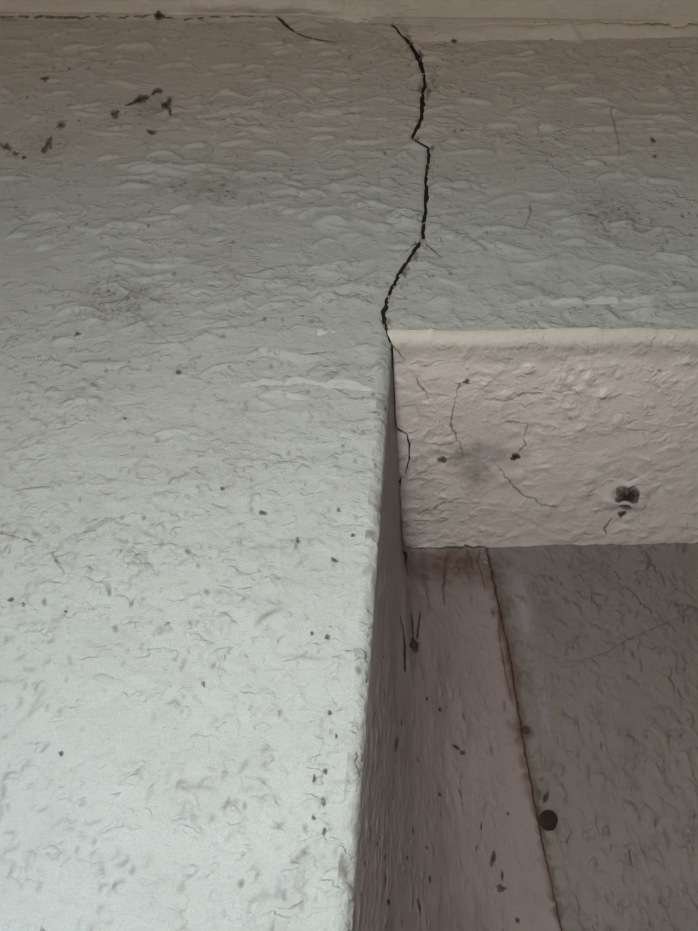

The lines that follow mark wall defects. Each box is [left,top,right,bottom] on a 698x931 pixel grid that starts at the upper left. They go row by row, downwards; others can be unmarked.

crack [380,24,442,574]
spalling [597,475,654,517]